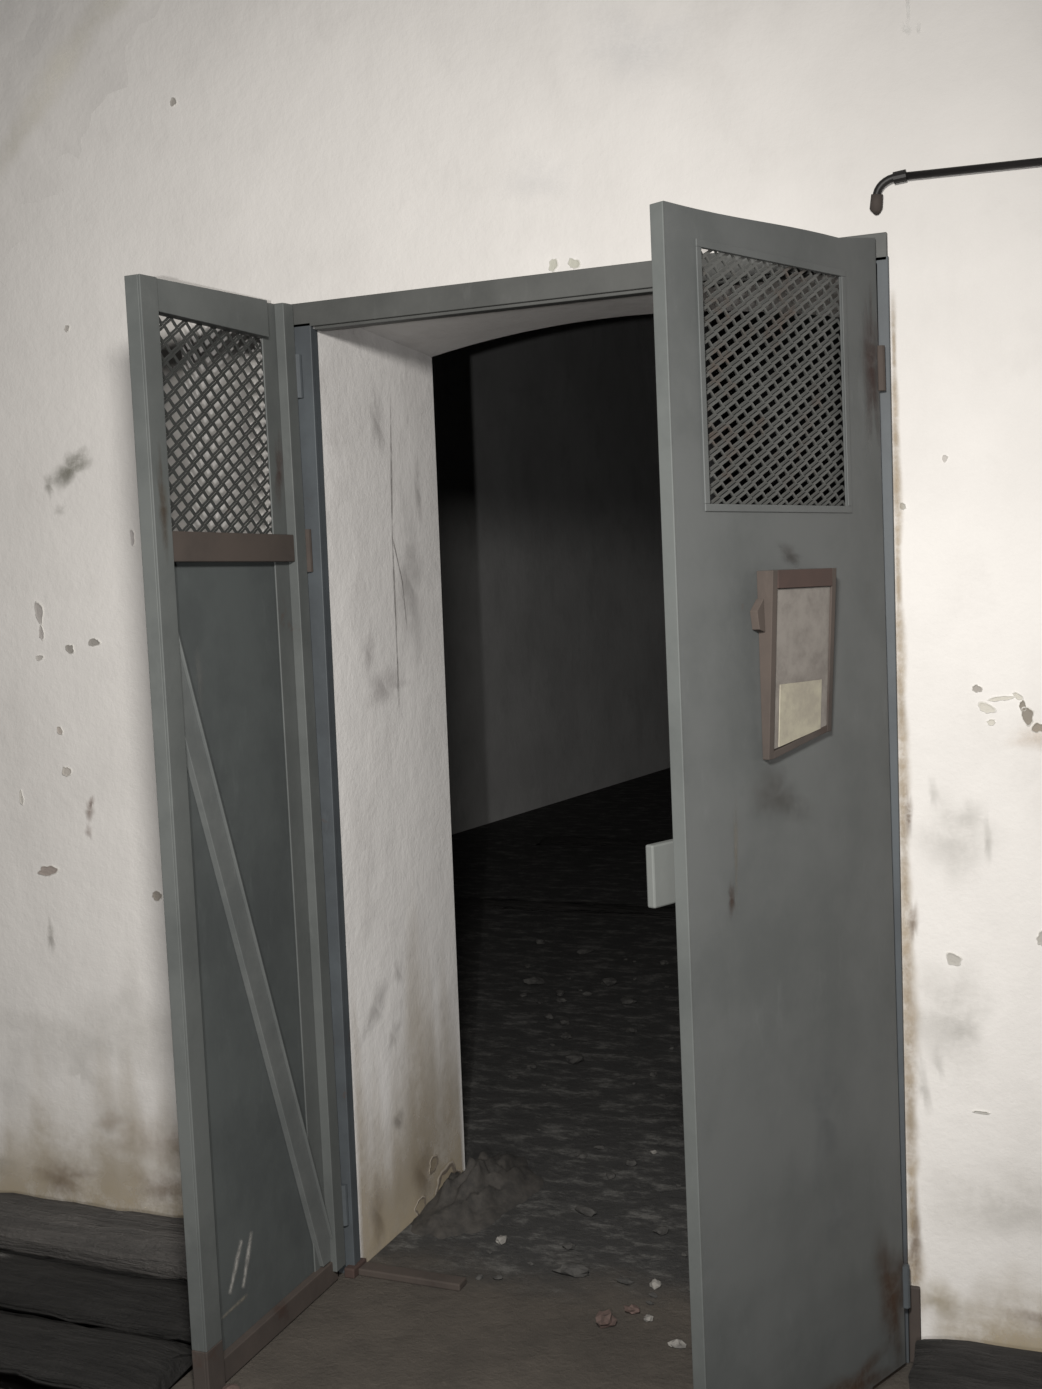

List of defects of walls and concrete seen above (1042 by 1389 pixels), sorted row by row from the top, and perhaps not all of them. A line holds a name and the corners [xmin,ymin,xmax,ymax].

spalling [34,601,45,661]
spalling [972,684,1042,733]
water stain [0,1157,184,1218]
water stain [361,1095,462,1262]
water stain [982,1329,1042,1352]